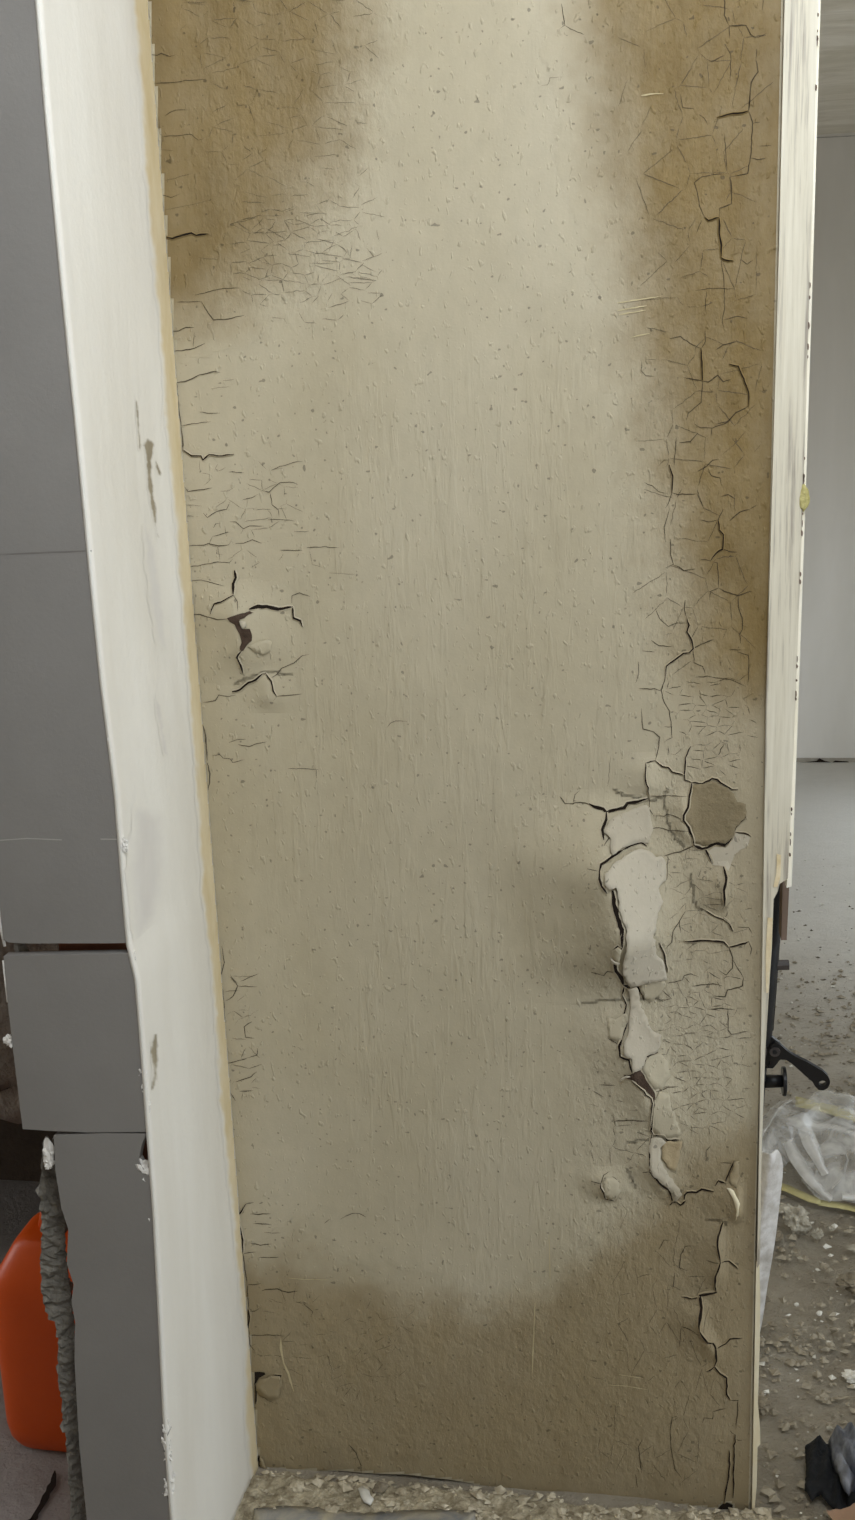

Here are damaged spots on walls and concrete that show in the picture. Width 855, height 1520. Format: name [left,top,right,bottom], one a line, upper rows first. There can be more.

leakage [132,0,781,1510]
peeling [603,805,682,1202]
crack [560,0,773,1504]
peeling [709,833,750,871]
peeling [727,1161,740,1219]